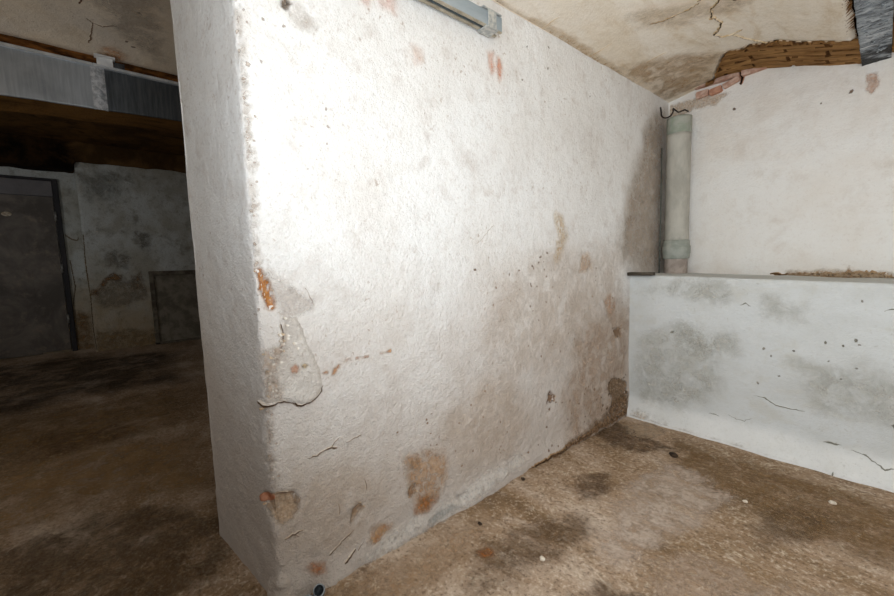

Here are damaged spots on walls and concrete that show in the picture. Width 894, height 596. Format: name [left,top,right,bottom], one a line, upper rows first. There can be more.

crack [649,0,768,43]
flaking render [670,0,889,117]
flaking render [254,261,274,311]
crack [754,395,800,411]
crack [308,434,363,459]
crack [823,441,894,471]
flaking render [259,491,300,524]
crack [329,504,364,564]